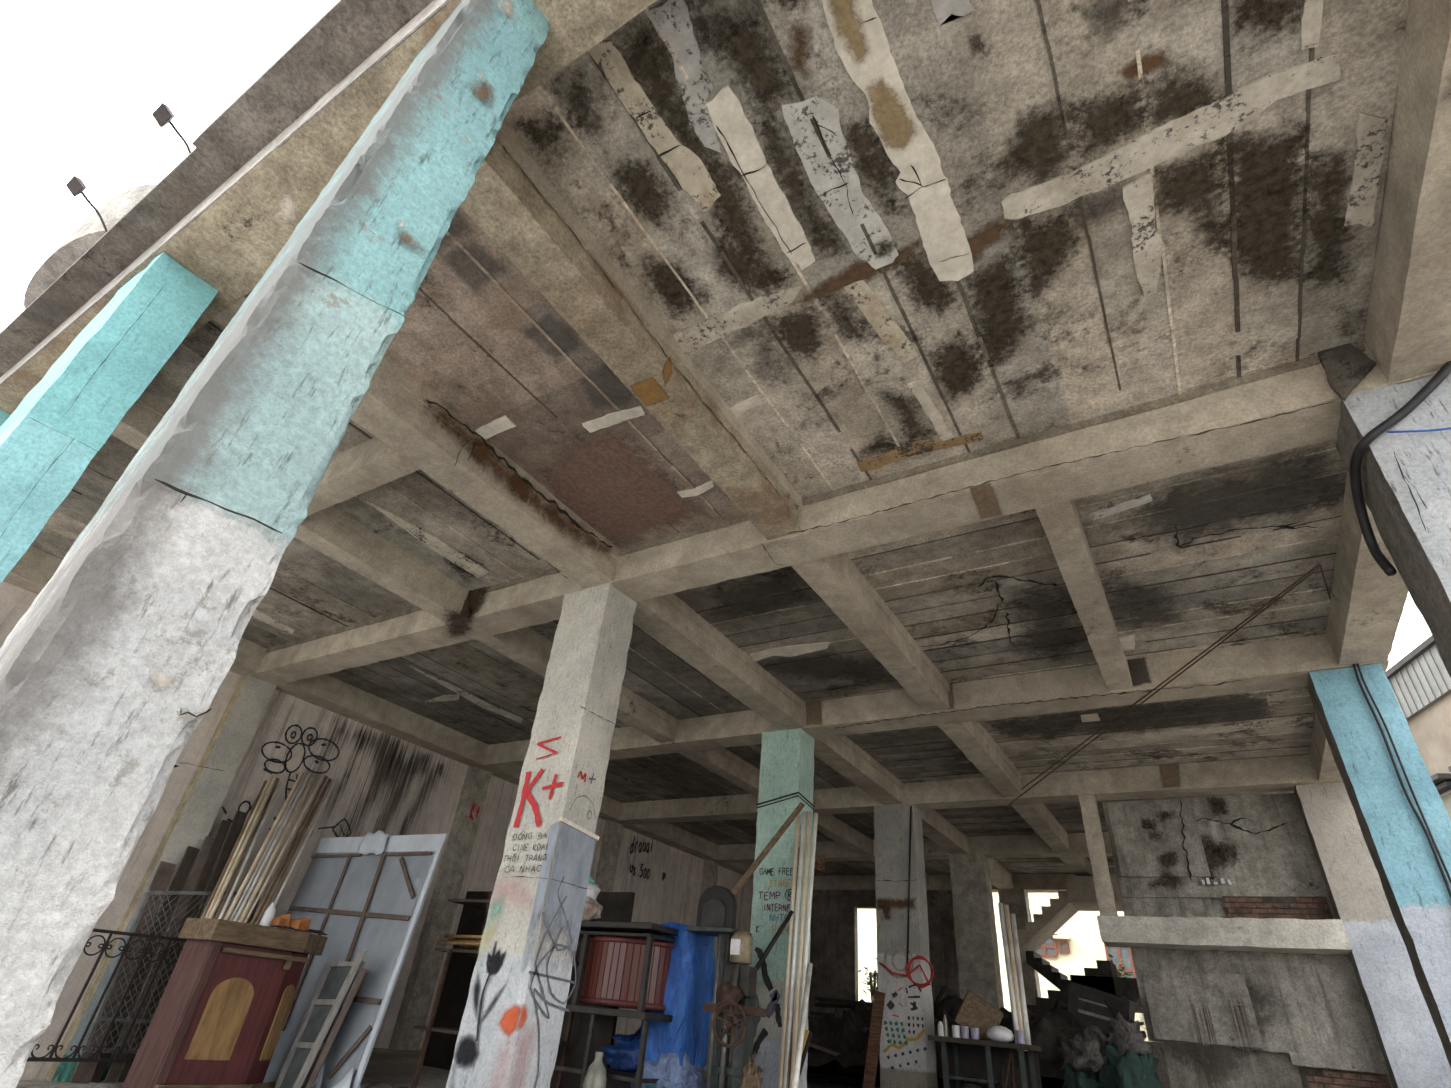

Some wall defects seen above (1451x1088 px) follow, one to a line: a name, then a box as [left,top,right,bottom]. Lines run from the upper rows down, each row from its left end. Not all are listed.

damp [1230,0,1304,38]
damp [613,26,793,296]
damp [699,0,850,257]
damp [843,122,907,215]
damp [1009,64,1225,184]
damp [1153,122,1355,287]
damp [642,255,708,318]
damp [738,294,866,383]
damp [894,197,1118,404]
rust [427,404,698,553]
crack [919,575,1075,649]
crack [1174,801,1286,883]